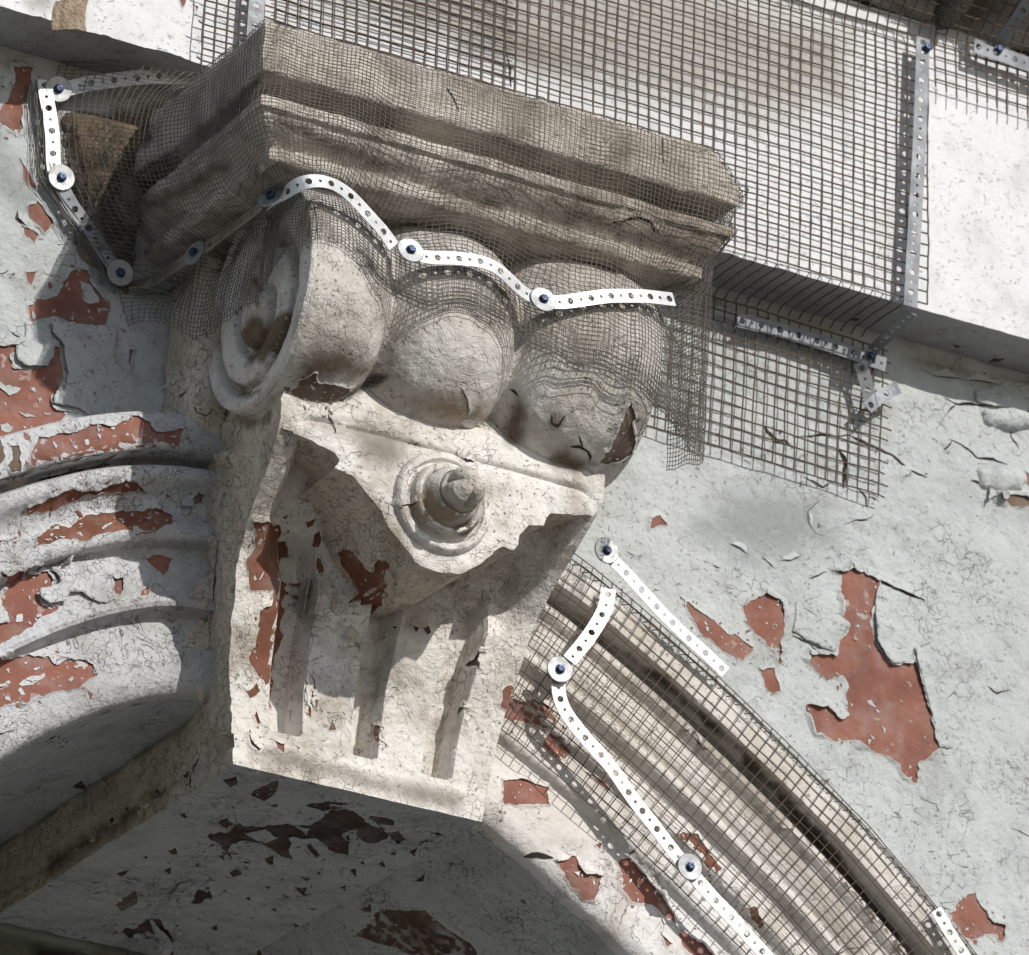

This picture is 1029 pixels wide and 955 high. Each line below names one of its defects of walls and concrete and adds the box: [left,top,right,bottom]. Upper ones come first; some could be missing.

peeling [0,60,37,140]
peeling [974,381,1029,411]
peeling [988,469,1029,510]
peeling [242,514,398,760]
peeling [678,558,953,785]
peeling [201,803,418,876]
peeling [351,904,480,955]
peeling [553,843,721,955]
peeling [947,887,1010,945]